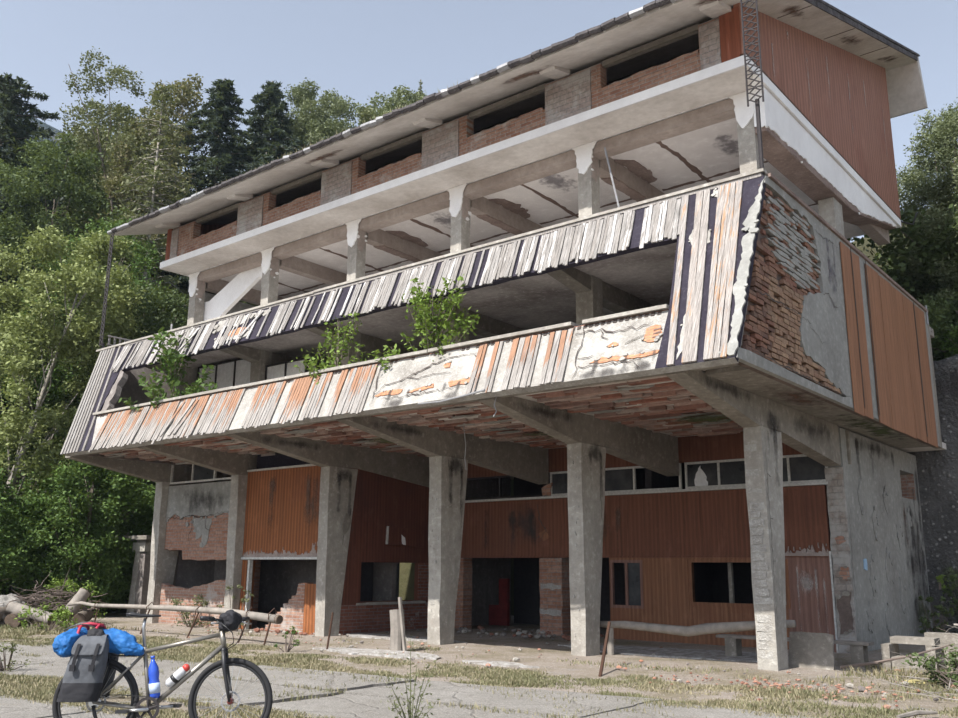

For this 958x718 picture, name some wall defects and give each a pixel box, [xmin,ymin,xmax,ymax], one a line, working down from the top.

spalling [718,178,841,394]
crack [572,318,657,378]
crack [369,353,476,406]
spalling [526,375,743,437]
spalling [836,566,854,635]